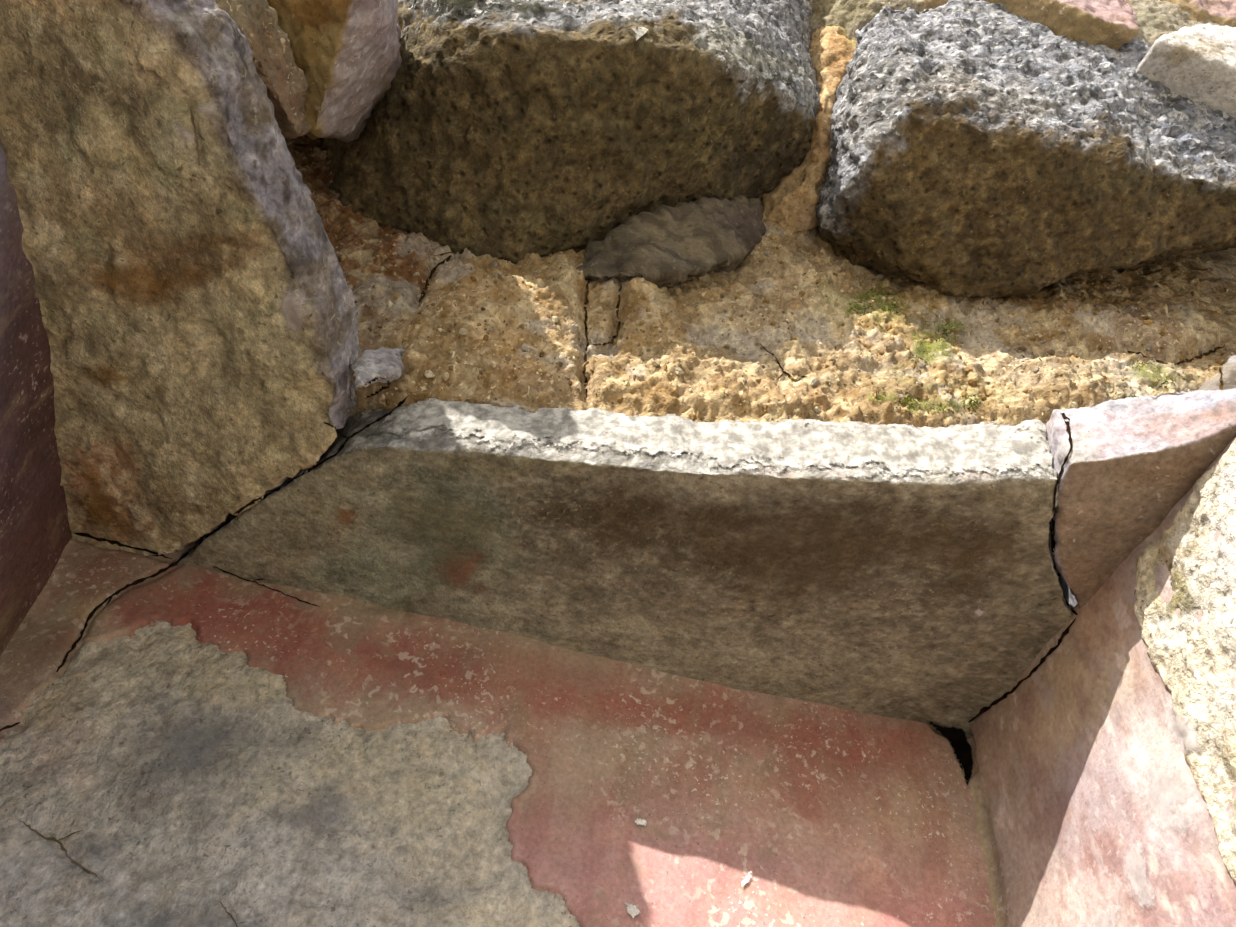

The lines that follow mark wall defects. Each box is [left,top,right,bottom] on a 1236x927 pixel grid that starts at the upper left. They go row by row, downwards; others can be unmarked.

crack [583,279,622,397]
crack [56,395,409,672]
crack [968,413,1078,723]
flaking render [0,620,579,927]
peeling [624,902,640,918]